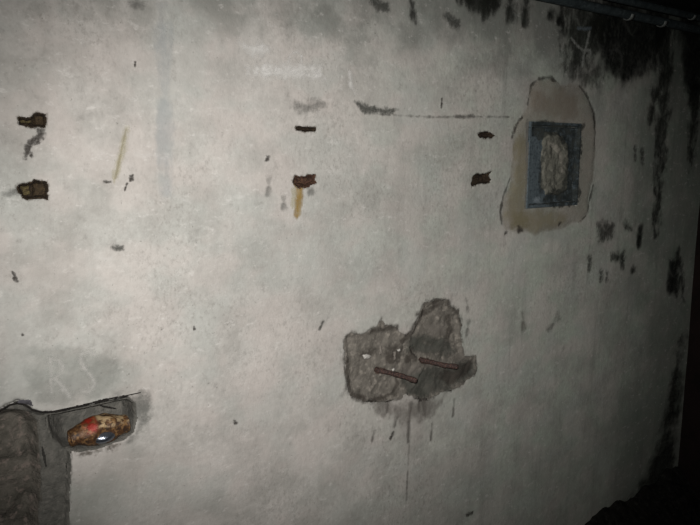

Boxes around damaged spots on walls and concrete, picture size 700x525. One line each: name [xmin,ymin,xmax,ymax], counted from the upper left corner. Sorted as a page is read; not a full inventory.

damp [548,0,673,240]
damp [681,17,700,163]
corrosion [292,184,303,218]
damp [667,251,684,297]
flaking render [343,298,477,402]
flaking render [0,397,138,525]